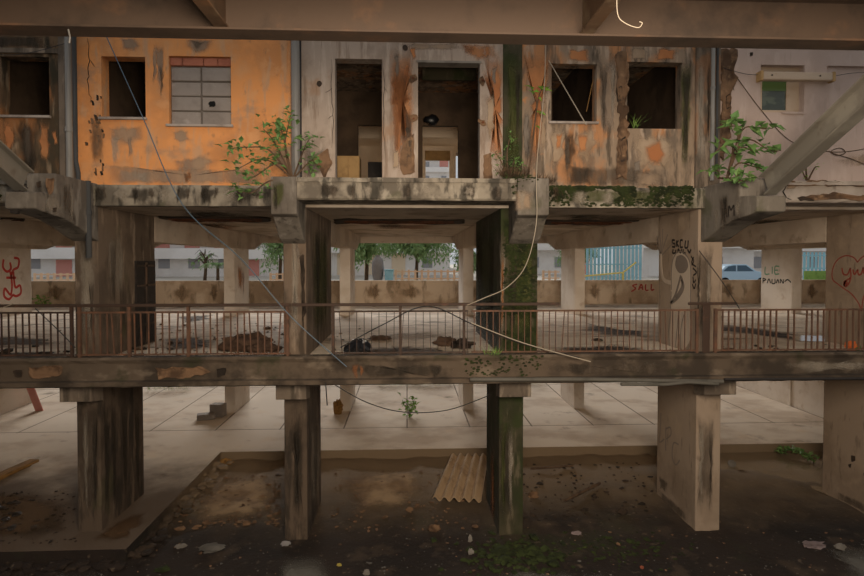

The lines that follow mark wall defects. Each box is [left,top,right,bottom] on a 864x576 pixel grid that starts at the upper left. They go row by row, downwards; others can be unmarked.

peeling [85,95,105,176]
water stain [123,157,259,201]
flaking render [307,149,332,177]
peeling [392,45,417,175]
peeling [478,67,502,178]
peeling [524,63,565,162]
flaking render [615,48,670,180]